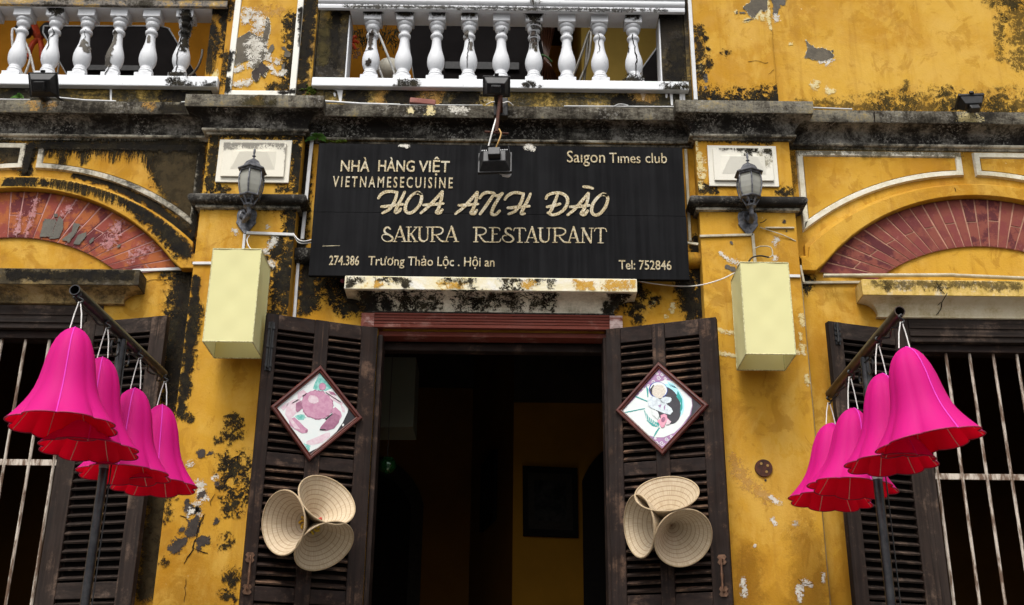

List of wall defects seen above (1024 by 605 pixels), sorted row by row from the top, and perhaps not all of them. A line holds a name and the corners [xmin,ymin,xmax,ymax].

peeling [232,4,291,88]
flaking render [734,0,787,30]
flaking render [804,39,835,66]
leakage [981,0,1024,72]
leakage [795,79,1024,122]
flaking render [13,198,155,264]
leakage [0,135,559,424]
leakage [601,269,702,326]
flaking render [185,449,214,468]
leakage [213,411,253,518]
flaking render [167,475,220,555]